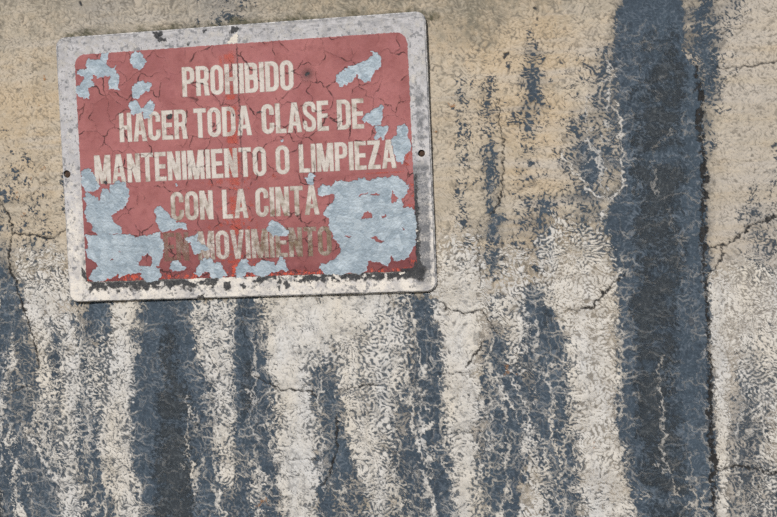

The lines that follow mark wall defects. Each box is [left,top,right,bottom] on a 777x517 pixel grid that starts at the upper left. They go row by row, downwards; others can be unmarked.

damp [452,79,473,172]
damp [506,30,554,157]
damp [566,109,603,139]
damp [0,150,35,203]
crack [3,206,66,364]
damp [453,179,471,232]
damp [477,75,513,284]
crack [694,66,777,515]
damp [752,223,777,264]